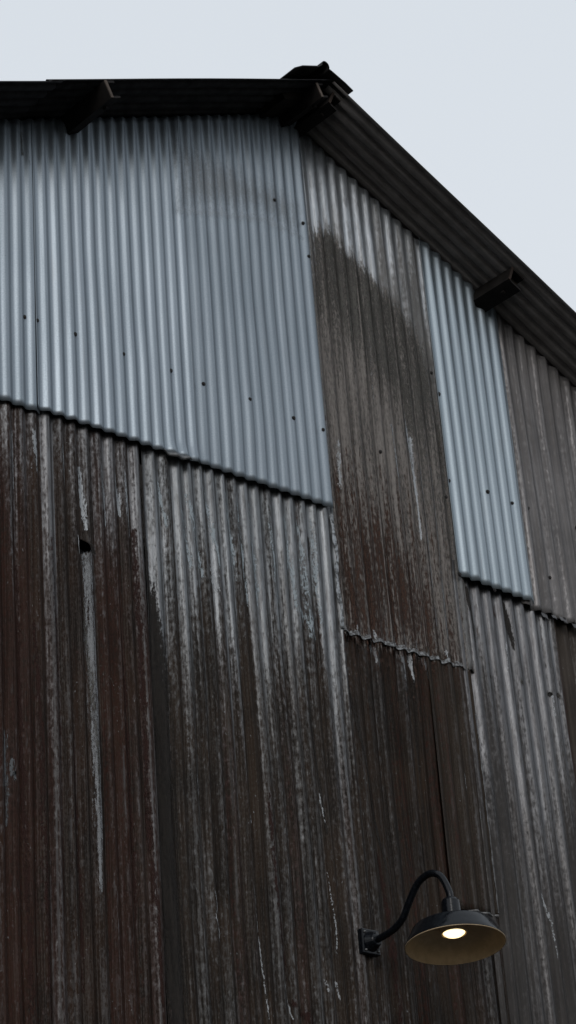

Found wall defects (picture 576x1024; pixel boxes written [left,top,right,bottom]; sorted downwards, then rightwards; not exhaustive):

corrosion [309,221,480,720]